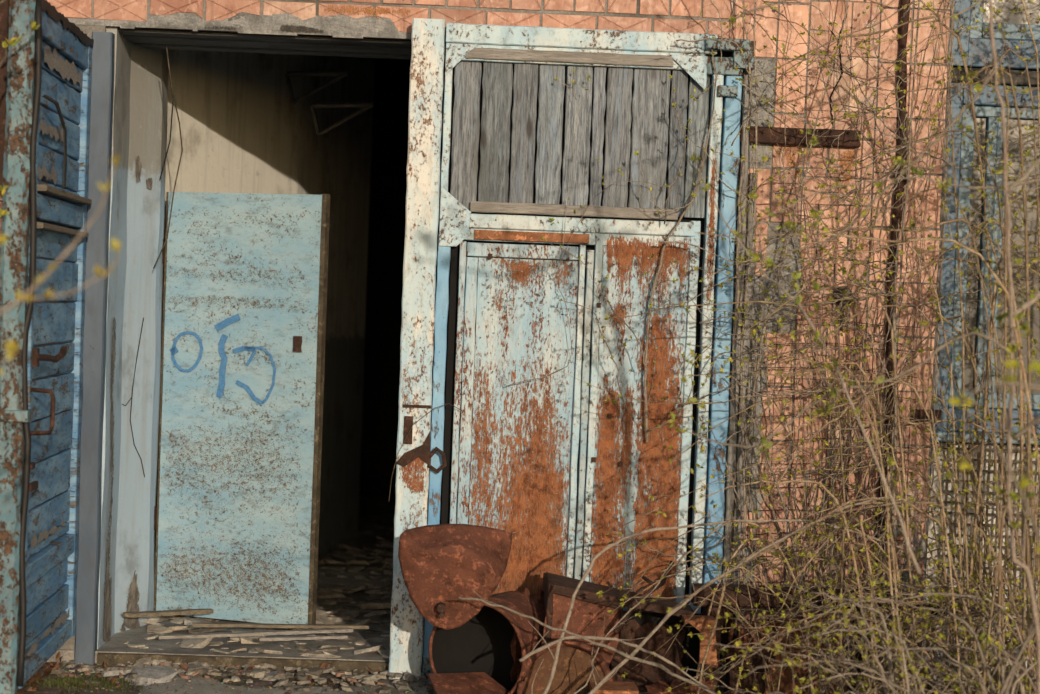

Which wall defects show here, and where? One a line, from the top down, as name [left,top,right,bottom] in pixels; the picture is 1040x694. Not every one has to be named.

spalling [68,12,412,39]
corrosion [483,257,575,314]
corrosion [468,359,571,596]
corrosion [590,234,690,601]